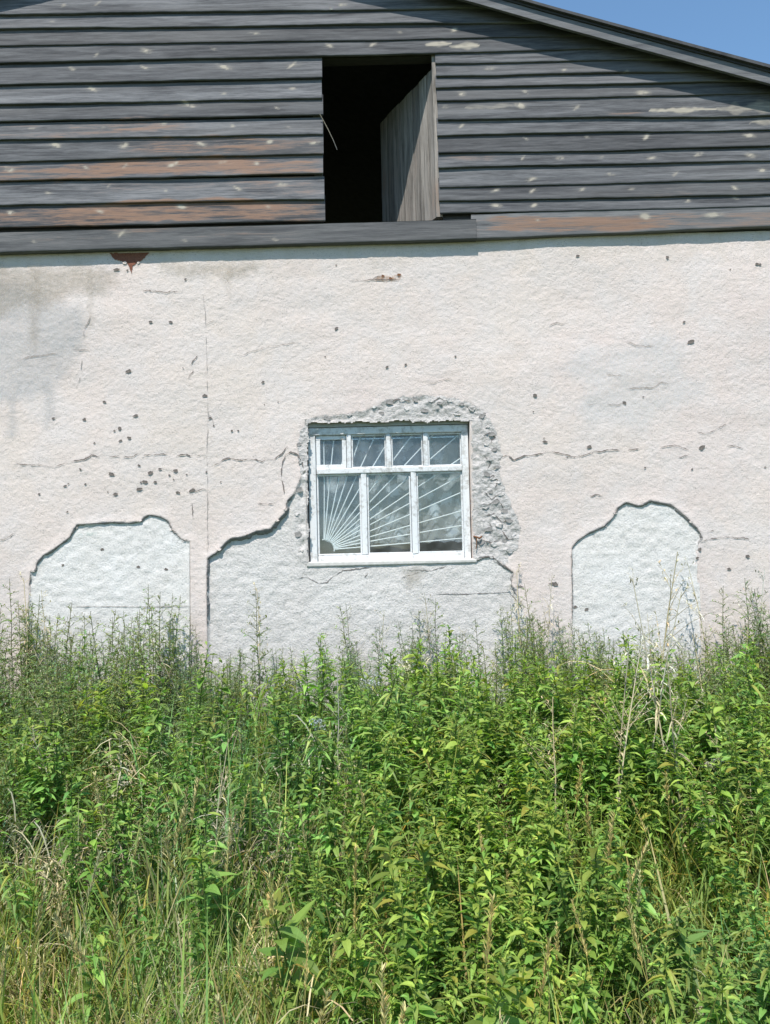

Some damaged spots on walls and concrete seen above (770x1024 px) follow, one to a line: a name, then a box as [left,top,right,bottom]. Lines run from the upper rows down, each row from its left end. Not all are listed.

peeling [29,515,191,724]
crack [17,349,304,555]
flaking render [136,464,195,494]
peeling [206,395,527,718]
crack [503,423,741,460]
peeling [571,501,703,704]